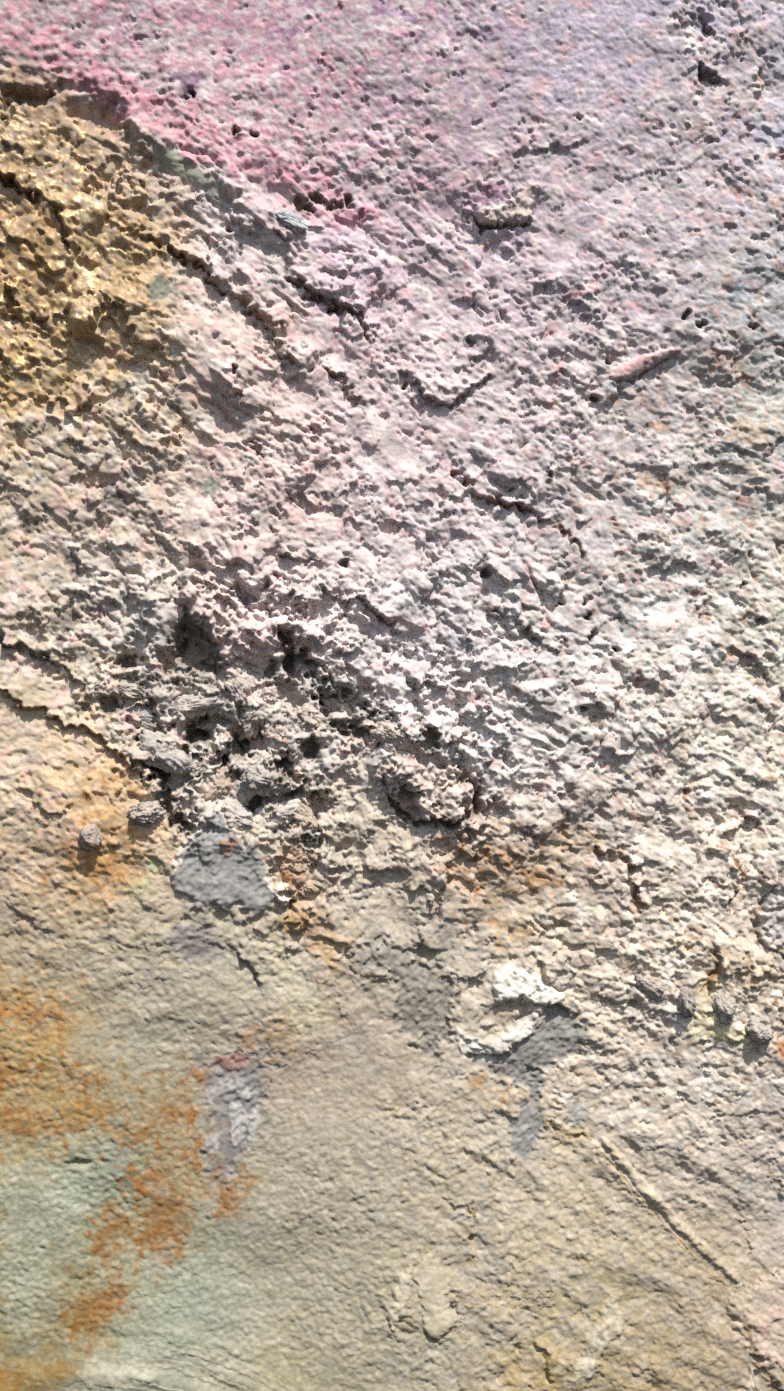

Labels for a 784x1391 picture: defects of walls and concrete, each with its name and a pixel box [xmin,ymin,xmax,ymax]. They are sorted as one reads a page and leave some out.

crack [131,222,375,413]
crack [397,367,493,411]
rust [0,724,319,1391]
flaking render [0,568,595,1166]